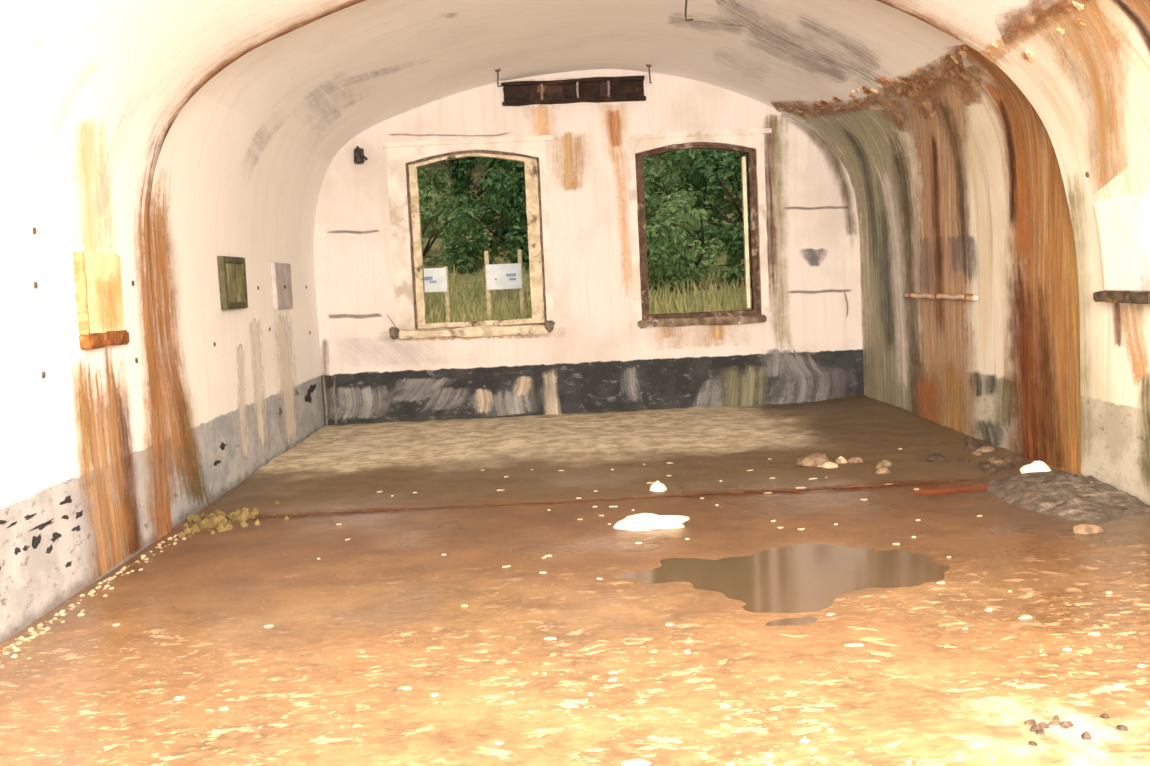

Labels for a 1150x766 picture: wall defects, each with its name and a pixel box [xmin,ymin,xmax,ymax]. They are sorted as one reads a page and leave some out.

rust [1115,0,1150,51]
rust [609,111,619,148]
damp [805,249,823,266]
damp [795,119,852,234]
damp [843,129,907,393]
rust [771,0,1120,475]
rust [78,117,206,576]
damp [238,319,265,457]
damp [278,315,297,445]
damp [974,372,1009,445]
rust [1114,303,1150,484]